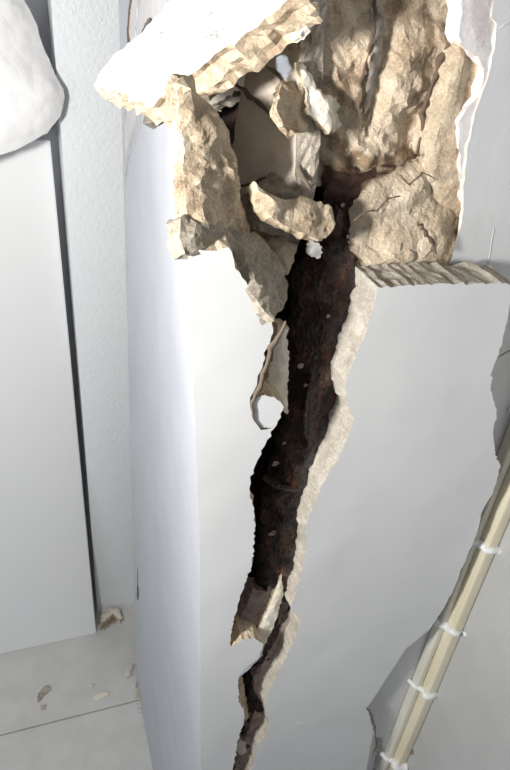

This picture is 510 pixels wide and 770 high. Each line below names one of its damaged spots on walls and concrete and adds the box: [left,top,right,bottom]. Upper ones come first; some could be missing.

peeling [127,0,170,43]
crack [297,164,326,205]
spalling [210,0,494,267]
crack [233,239,309,770]
corrosion [244,164,393,721]